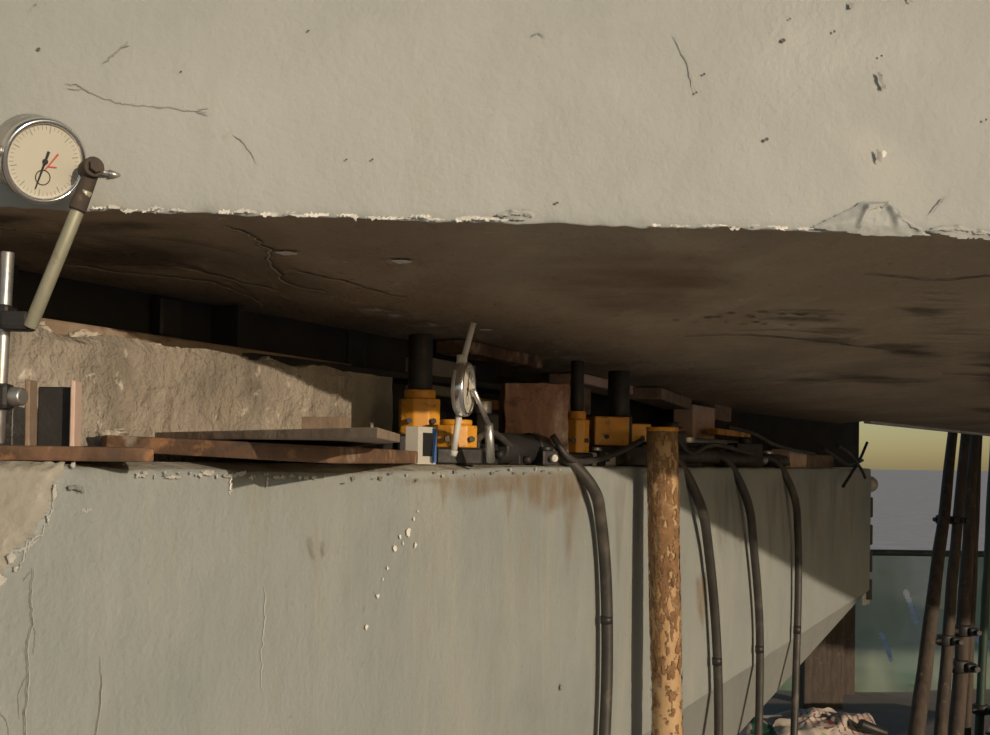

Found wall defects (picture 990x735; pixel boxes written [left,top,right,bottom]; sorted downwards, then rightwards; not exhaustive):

crack [66,83,208,116]
spalling [0,461,84,586]
crack [0,568,35,735]